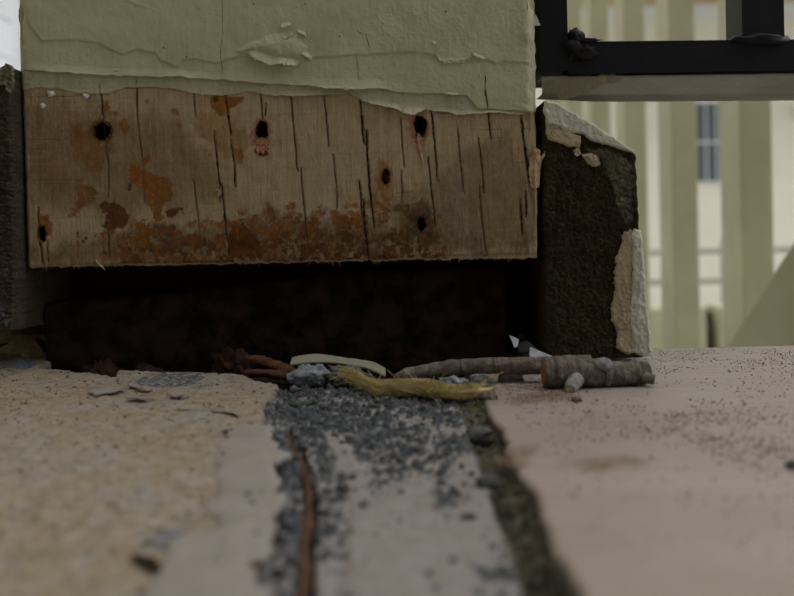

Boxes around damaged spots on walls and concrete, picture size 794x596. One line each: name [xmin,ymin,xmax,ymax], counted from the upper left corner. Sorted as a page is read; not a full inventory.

crack [214,96,235,259]
rust [210,96,244,116]
rust [69,156,446,264]
peeling [25,63,532,115]
crack [359,100,375,259]
crack [428,112,437,228]
crack [457,76,491,251]
crack [520,117,530,235]
peeling [543,101,652,357]
peeling [529,347,551,357]
crack [287,429,321,596]